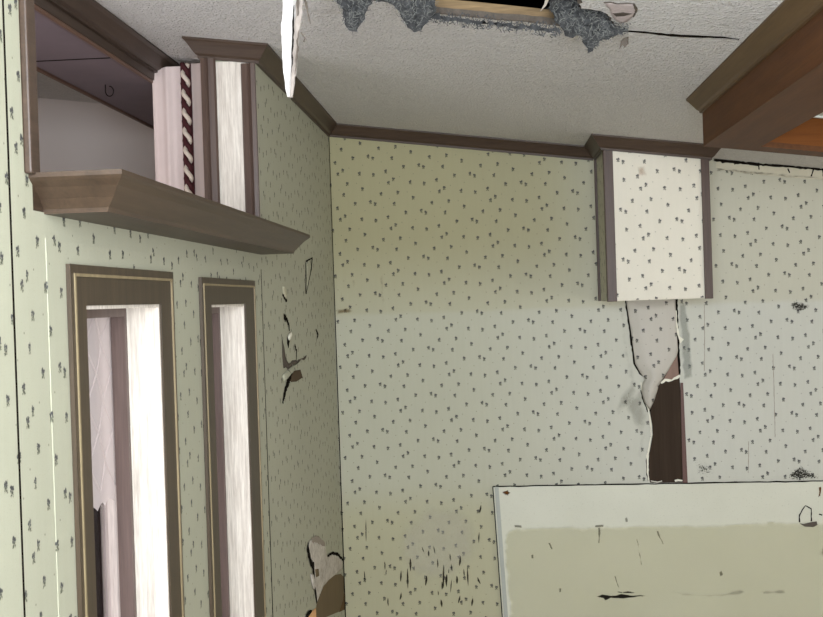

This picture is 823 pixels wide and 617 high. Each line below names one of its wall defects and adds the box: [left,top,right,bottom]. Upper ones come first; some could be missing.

peeling [604,2,638,23]
crack [628,31,739,40]